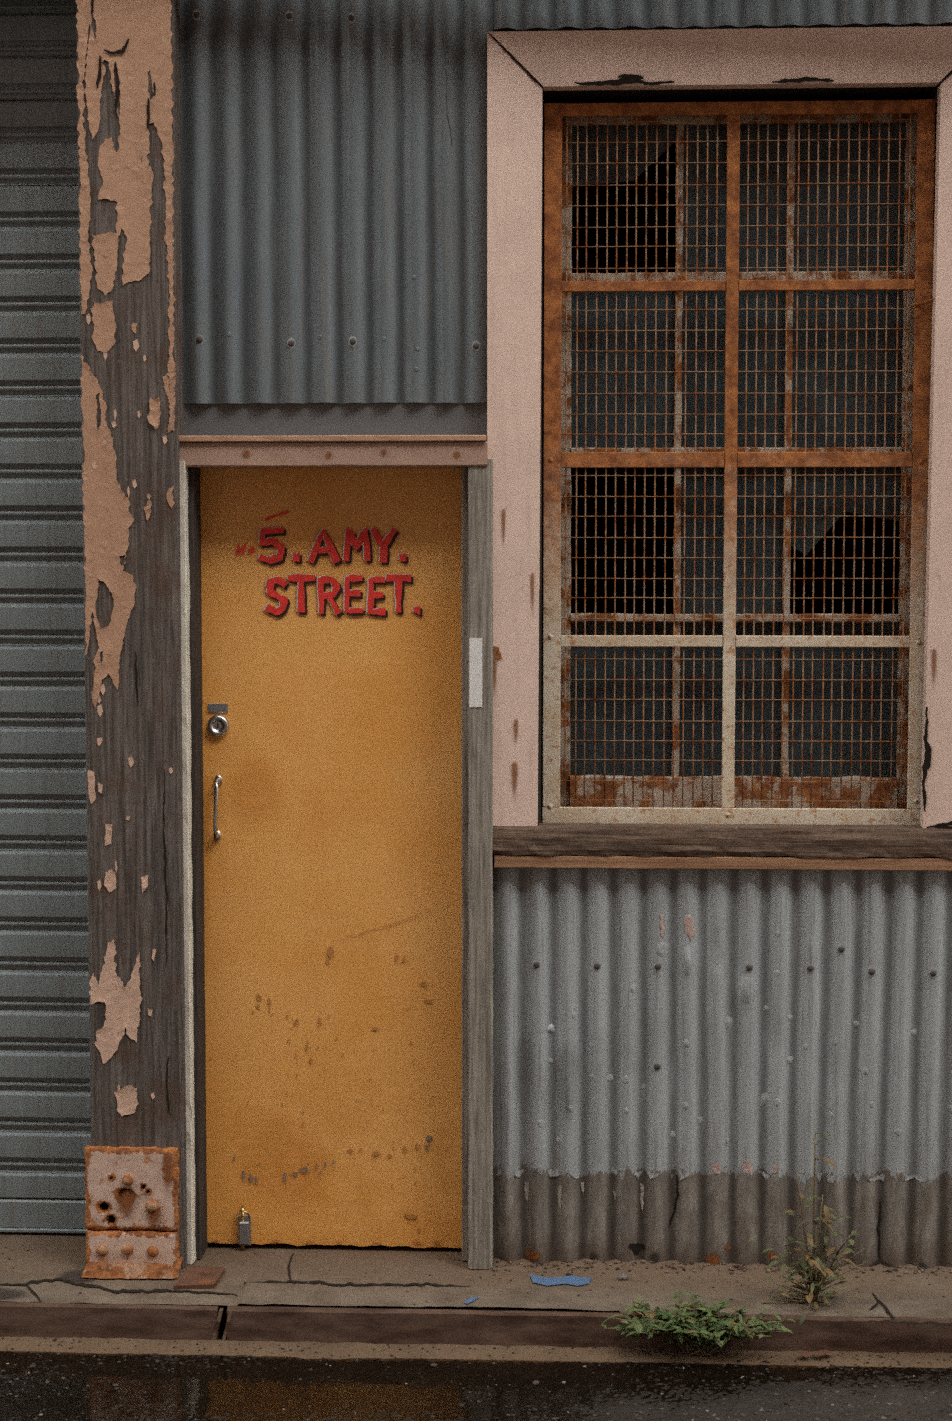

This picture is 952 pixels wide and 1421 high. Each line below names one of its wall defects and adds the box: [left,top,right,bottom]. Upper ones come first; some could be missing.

peeling [76,0,176,717]
peeling [87,770,103,804]
peeling [105,816,130,846]
peeling [97,860,118,893]
peeling [89,939,156,1064]
peeling [114,1085,155,1116]
corrosion [164,1153,172,1186]
corrosion [119,1192,160,1225]